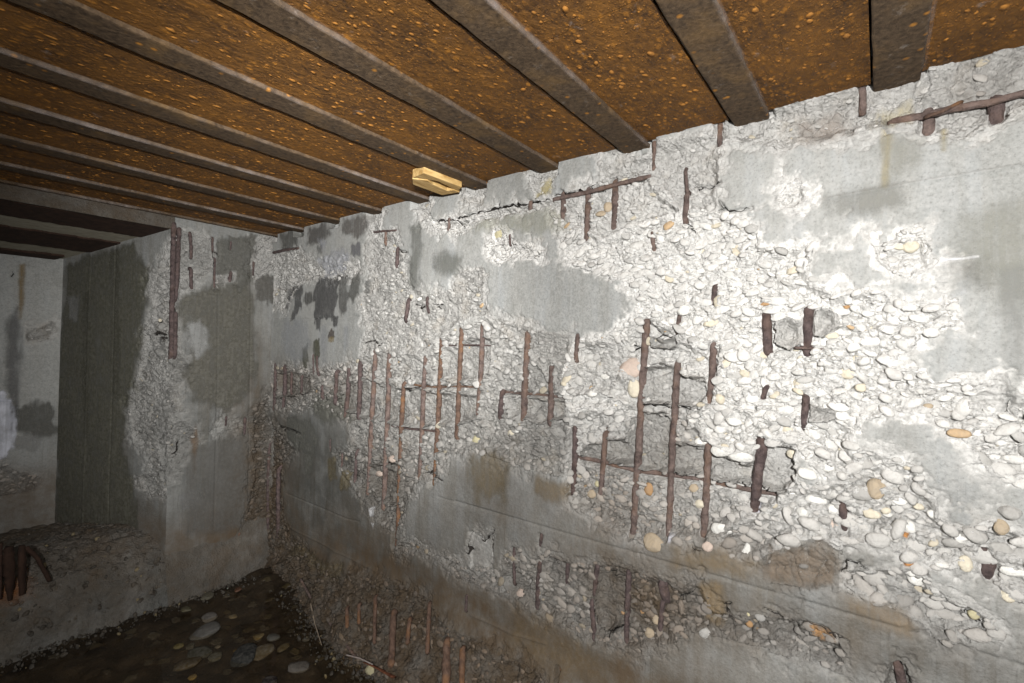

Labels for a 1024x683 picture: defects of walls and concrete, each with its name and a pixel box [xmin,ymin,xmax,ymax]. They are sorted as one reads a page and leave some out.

spalling [127,222,236,497]
water stain [280,215,371,368]
crack [430,184,604,227]
spalling [213,45,1024,683]